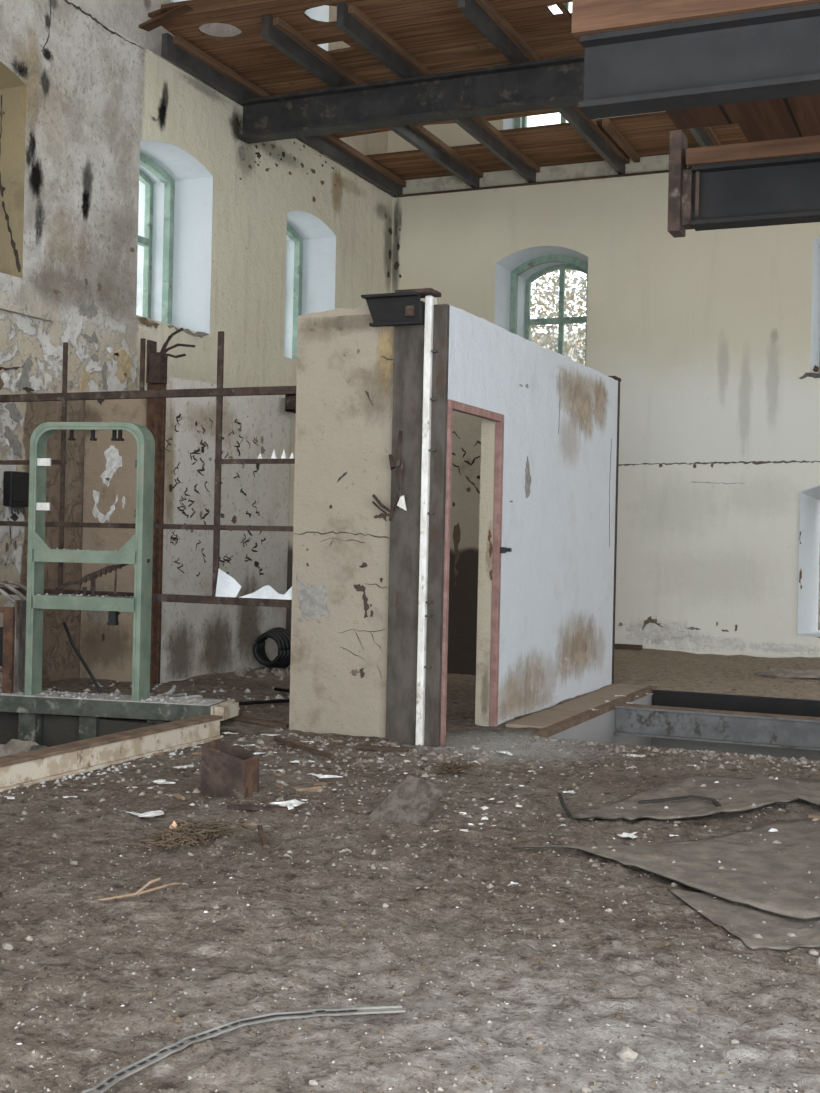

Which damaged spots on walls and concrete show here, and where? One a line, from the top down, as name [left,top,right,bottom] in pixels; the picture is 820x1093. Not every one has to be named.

crack [43,0,144,51]
crack [0,95,21,272]
flaking render [234,118,336,186]
peeling [78,279,132,405]
flaking render [799,366,820,379]
peeling [92,445,125,523]
peeling [169,417,266,577]
crack [609,438,820,547]
crack [294,531,390,546]